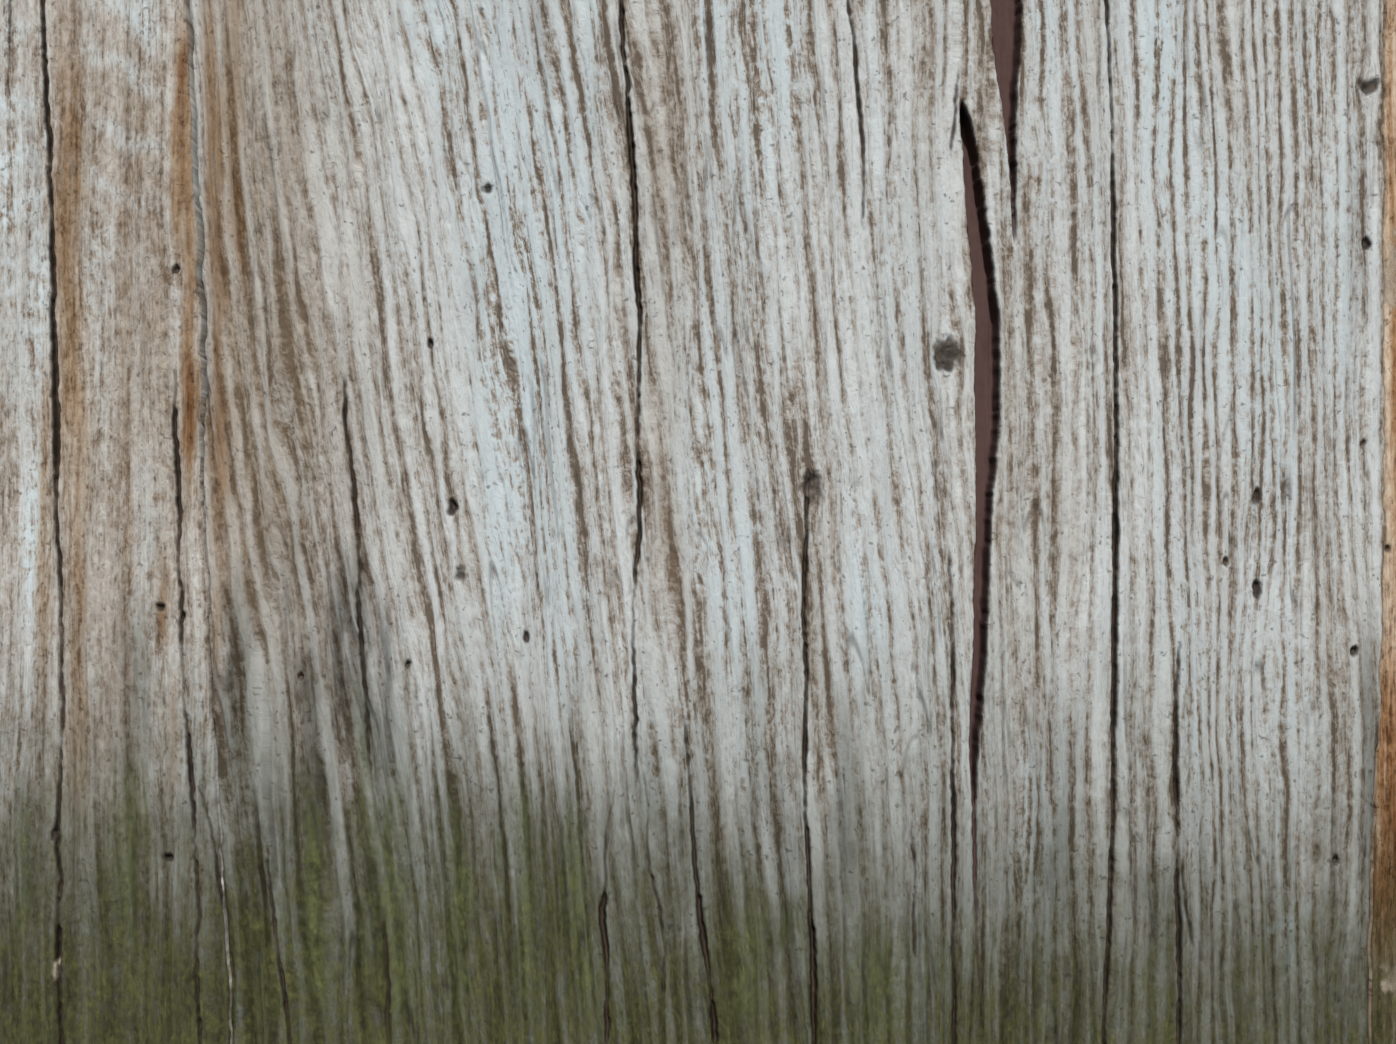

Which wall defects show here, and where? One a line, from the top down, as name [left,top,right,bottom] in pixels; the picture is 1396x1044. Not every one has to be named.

crack [7,0,65,1044]
crack [599,891,610,1042]
crack [619,0,643,583]
crack [631,638,639,760]
crack [649,861,663,929]
crack [801,496,817,1044]
crack [910,901,918,954]
crack [948,0,1022,1044]